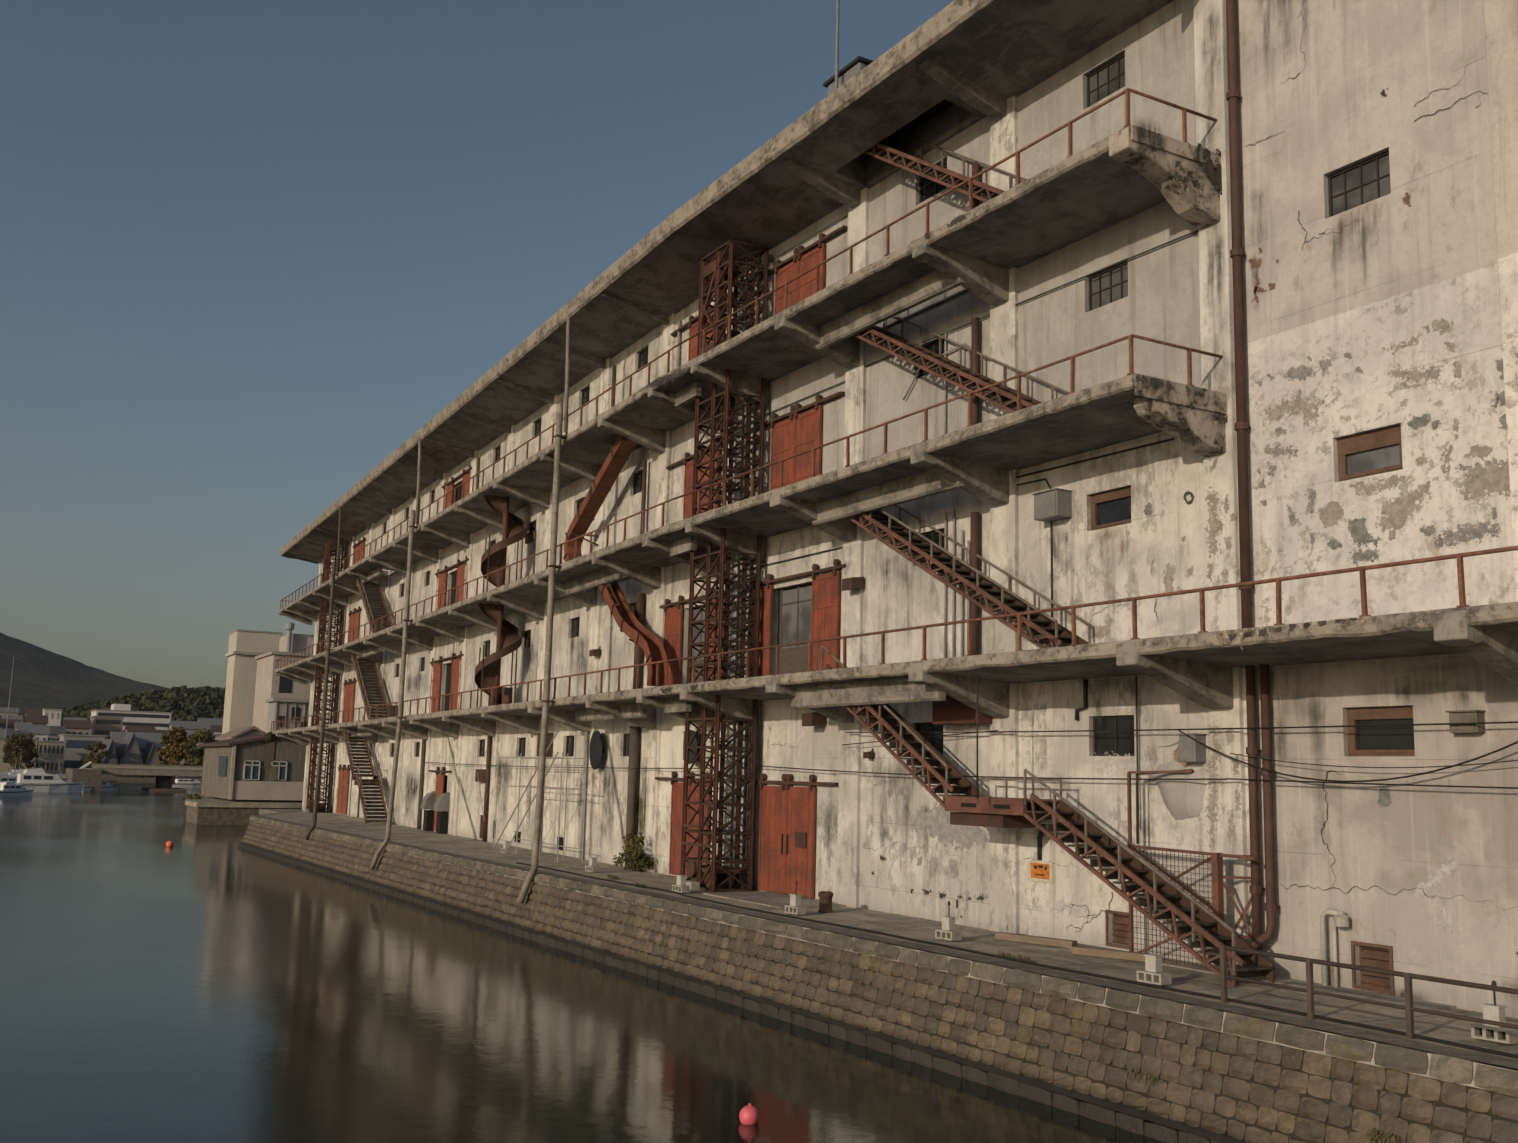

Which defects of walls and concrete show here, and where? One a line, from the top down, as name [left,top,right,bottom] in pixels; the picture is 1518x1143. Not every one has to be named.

crack [1414,64,1483,122]
peeling [1248,248,1279,303]
peeling [1255,353,1363,506]
peeling [1381,317,1464,390]
peeling [1491,352,1518,431]
spalling [1286,413,1510,567]
crack [1281,771,1518,910]
crack [1026,857,1113,932]